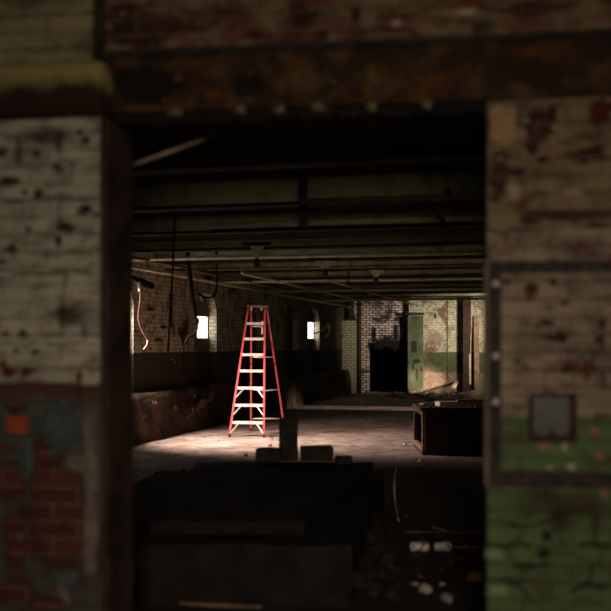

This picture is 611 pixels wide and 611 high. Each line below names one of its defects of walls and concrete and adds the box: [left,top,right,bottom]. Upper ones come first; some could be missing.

spalling [524,104,557,163]
peeling [490,105,525,202]
peeling [561,145,611,164]
spalling [520,209,611,228]
peeling [423,371,447,391]
spalling [6,415,30,434]
peeling [65,404,99,575]